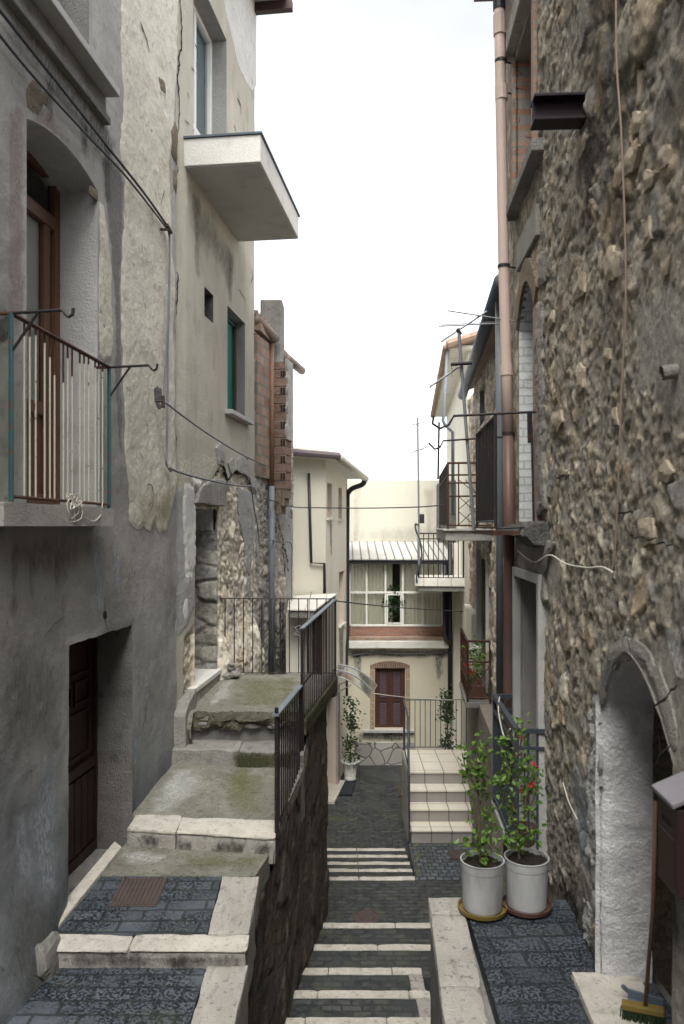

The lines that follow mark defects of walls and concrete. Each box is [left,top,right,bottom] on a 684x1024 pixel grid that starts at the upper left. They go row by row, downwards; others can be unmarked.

spalling [26,80,49,114]
crack [161,0,198,131]
flaking render [89,0,257,636]
flaking render [267,494,293,600]